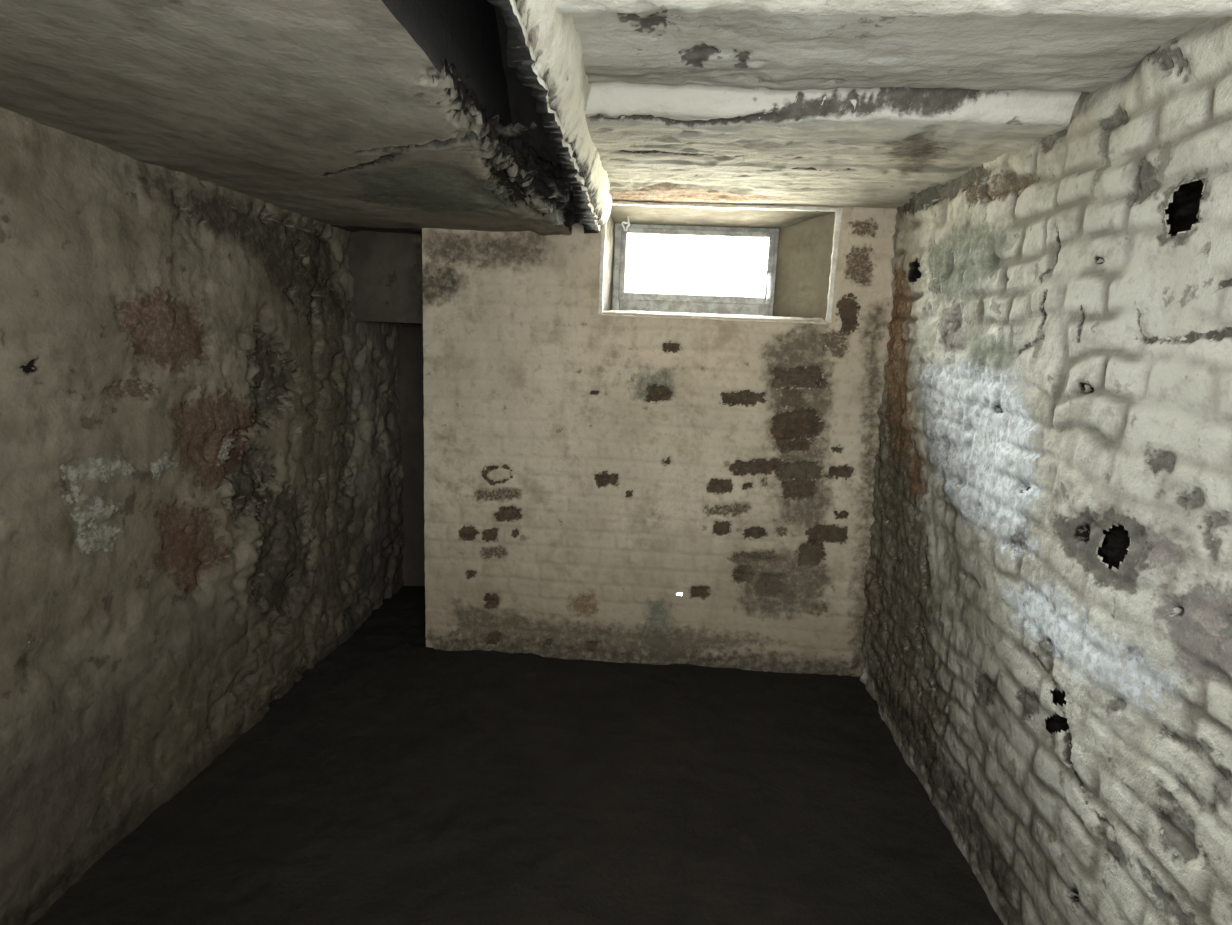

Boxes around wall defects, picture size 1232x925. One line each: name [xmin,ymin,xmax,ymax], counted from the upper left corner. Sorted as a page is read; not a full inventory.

leakage [515,0,790,230]
leakage [886,134,944,174]
spalling [1101,107,1130,131]
spalling [1128,157,1209,246]
leakage [762,325,832,531]
leakage [916,359,1040,559]
spalling [1146,450,1175,473]
leakage [437,400,1018,925]
spalling [1016,690,1039,719]
leakage [1005,585,1174,708]
spalling [1107,697,1127,712]
spalling [1053,487,1232,683]